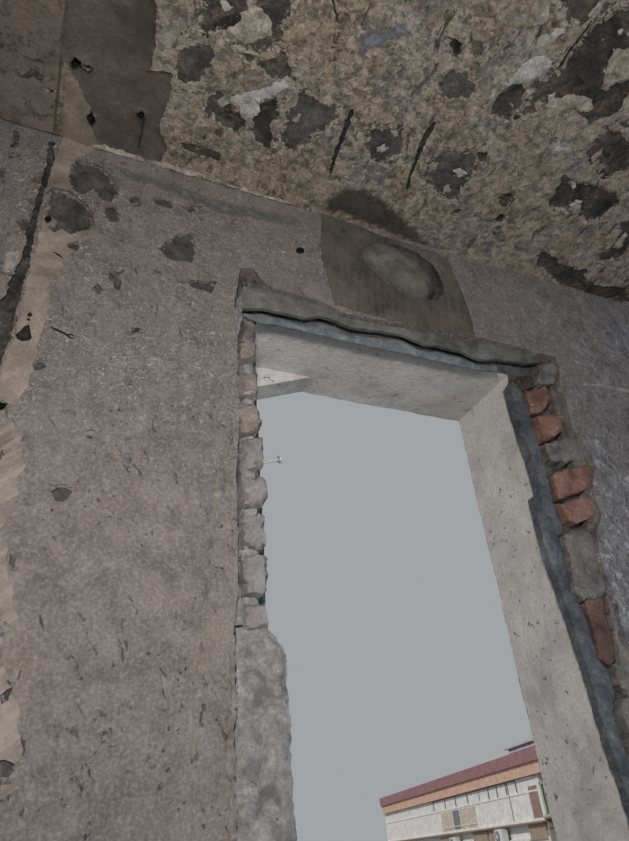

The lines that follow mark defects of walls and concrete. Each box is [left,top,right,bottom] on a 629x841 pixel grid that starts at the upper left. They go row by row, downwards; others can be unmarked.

peeling [176,142,225,163]
peeling [179,0,342,153]
crack [329,109,354,174]
peeling [363,124,408,165]
crack [406,122,436,190]
peeling [421,147,492,205]
peeling [436,68,479,102]
peeling [488,0,629,225]
flaking render [158,233,196,263]
peeling [597,220,629,263]
peeling [533,251,629,305]
flaking render [233,274,629,841]